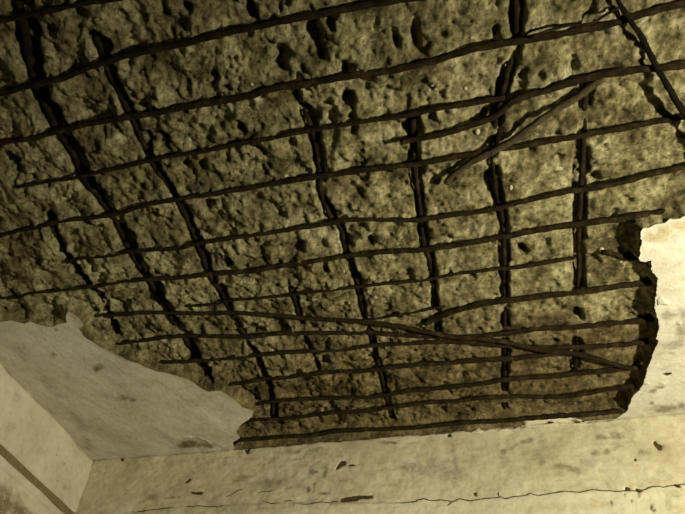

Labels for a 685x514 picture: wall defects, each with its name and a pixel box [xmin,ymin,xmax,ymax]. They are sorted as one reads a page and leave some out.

spalling [0,0,685,297]
spalling [0,114,685,454]
crack [138,489,242,512]
crack [259,489,337,505]
crack [399,484,685,506]